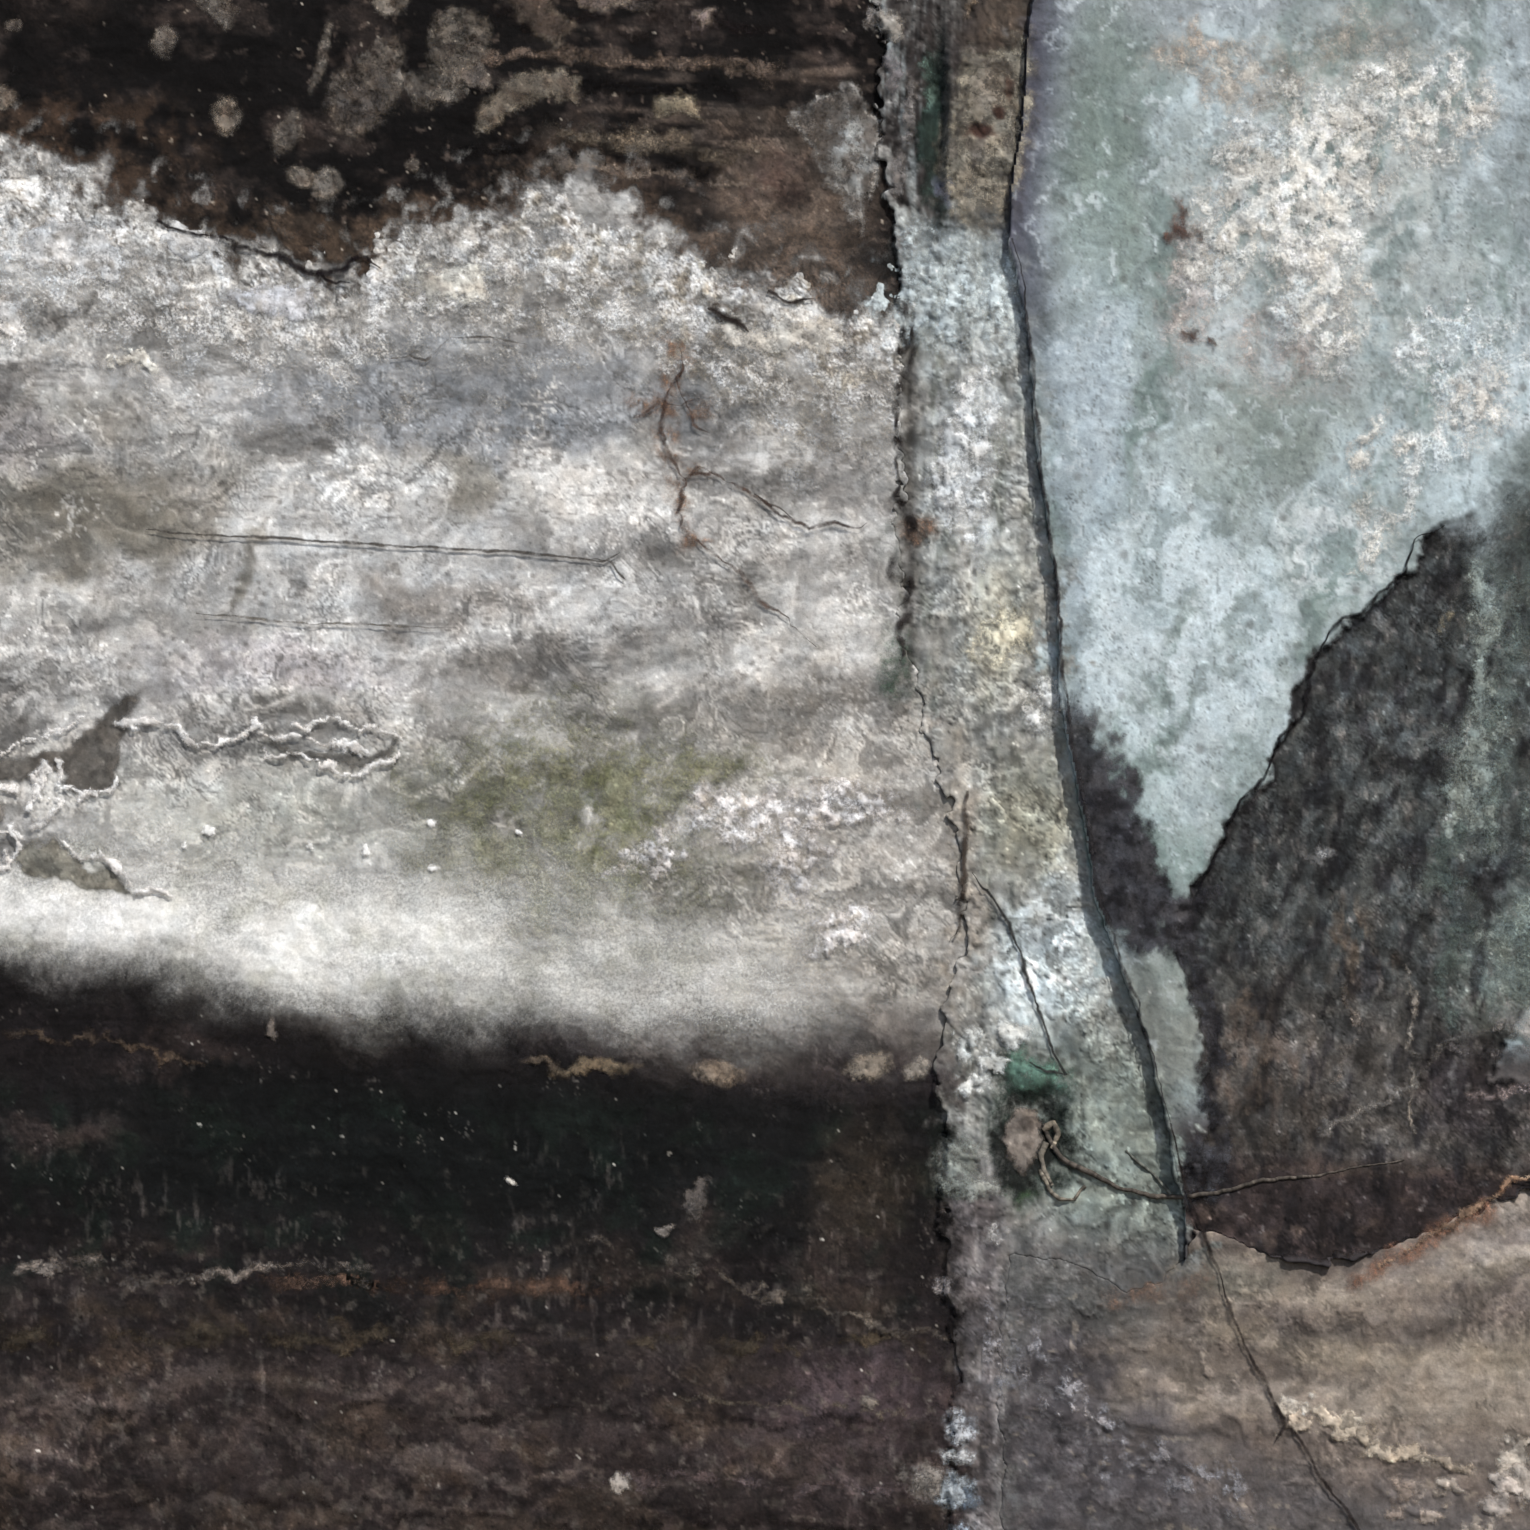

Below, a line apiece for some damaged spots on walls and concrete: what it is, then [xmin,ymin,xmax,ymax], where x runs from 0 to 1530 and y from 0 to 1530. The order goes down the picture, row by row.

crack [156,219,381,285]
damp [0,0,1026,463]
crack [146,529,625,579]
crack [887,284,930,660]
peeling [0,694,402,898]
crack [949,790,1067,1075]
damp [1020,677,1237,1209]
crack [1196,525,1445,895]
damp [0,818,1049,1530]
rust [1350,1175,1530,1287]
damp [1044,1378,1127,1454]
damp [1166,1465,1247,1517]